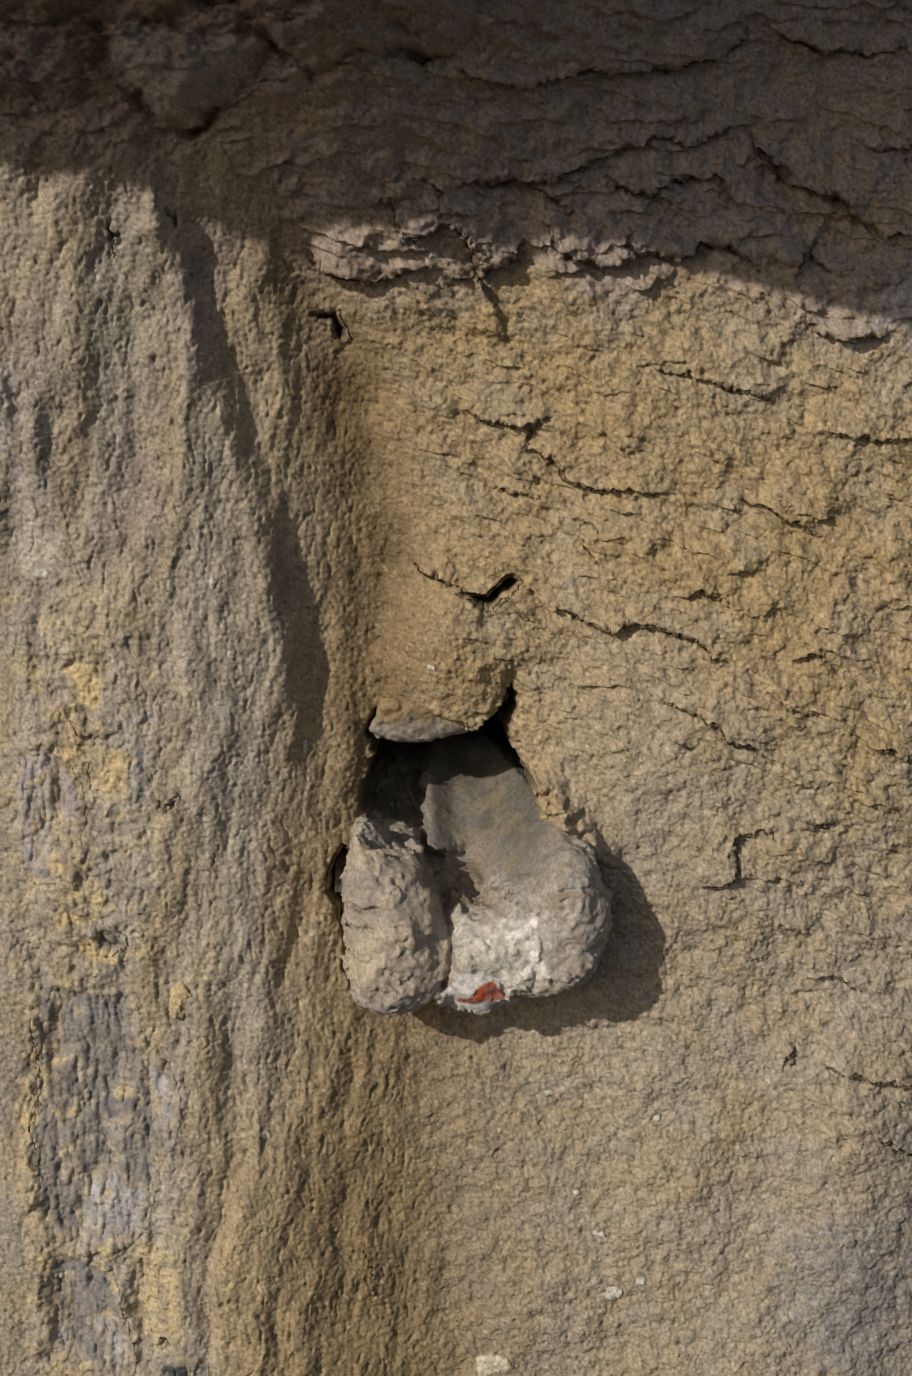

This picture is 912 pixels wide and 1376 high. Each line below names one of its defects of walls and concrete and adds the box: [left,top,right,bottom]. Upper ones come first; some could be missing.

crack [304,249,378,287]
crack [710,381,775,403]
crack [836,434,912,443]
crack [461,410,616,567]
crack [742,494,813,536]
crack [408,557,461,594]
crack [687,589,729,607]
crack [565,610,726,667]
crack [657,698,763,759]
spalling [270,195,912,1376]
crack [706,821,842,891]
crack [786,1045,912,1090]